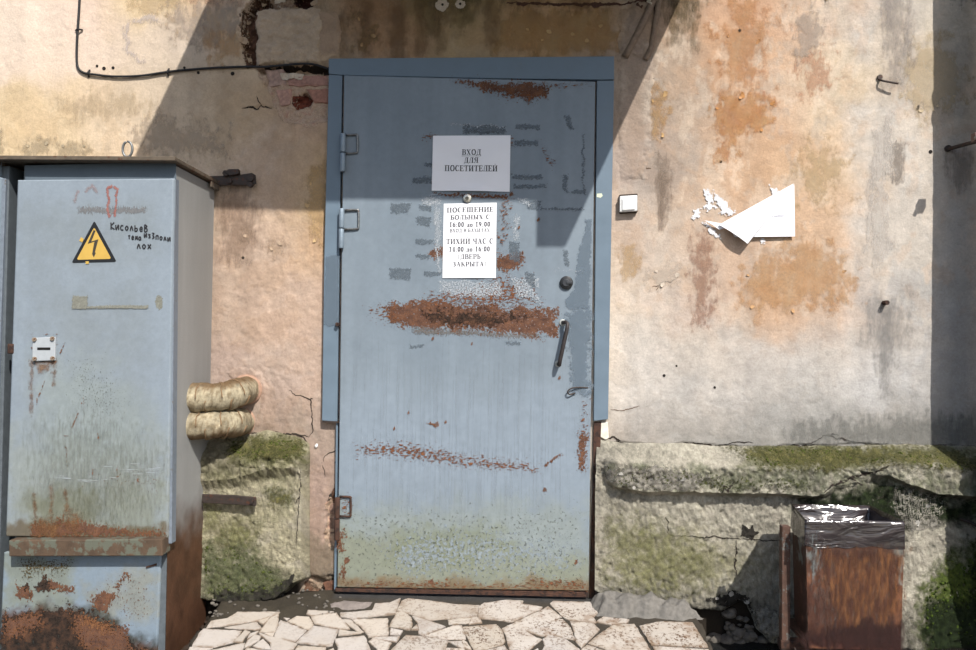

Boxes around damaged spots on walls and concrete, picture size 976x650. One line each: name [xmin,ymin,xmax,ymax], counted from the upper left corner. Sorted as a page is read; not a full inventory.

flaking render [171,0,329,128]
rust [452,78,587,107]
rust [362,192,559,345]
crack [250,391,336,542]
rust [356,439,563,474]
rust [575,398,593,471]
crack [684,439,752,447]
crack [779,433,889,493]
spalling [706,590,797,644]